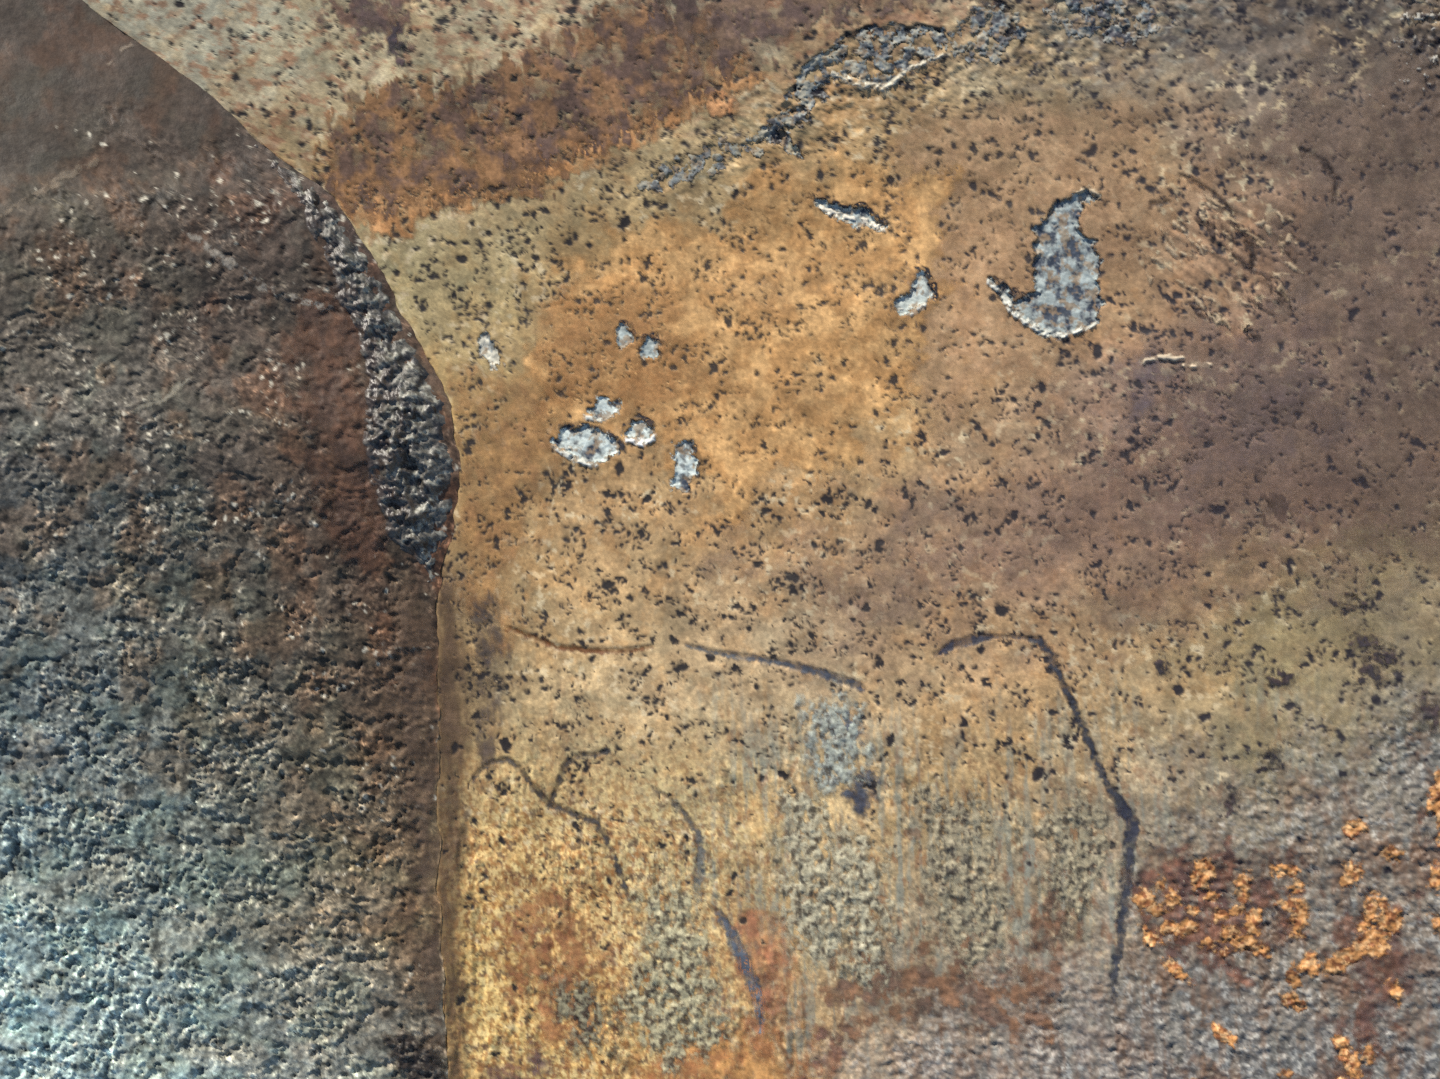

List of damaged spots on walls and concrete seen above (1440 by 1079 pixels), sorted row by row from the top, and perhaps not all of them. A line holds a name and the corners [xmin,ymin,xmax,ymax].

peeling [637,4,1026,192]
peeling [814,195,889,232]
peeling [894,266,938,316]
peeling [987,185,1106,340]
peeling [550,396,702,492]
crack [685,644,864,692]
crack [472,747,630,901]
crack [938,635,1140,1001]
corrosion [1341,819,1368,840]
corrosion [1416,769,1440,896]
crack [656,791,765,1033]
corrosion [1131,836,1440,1079]